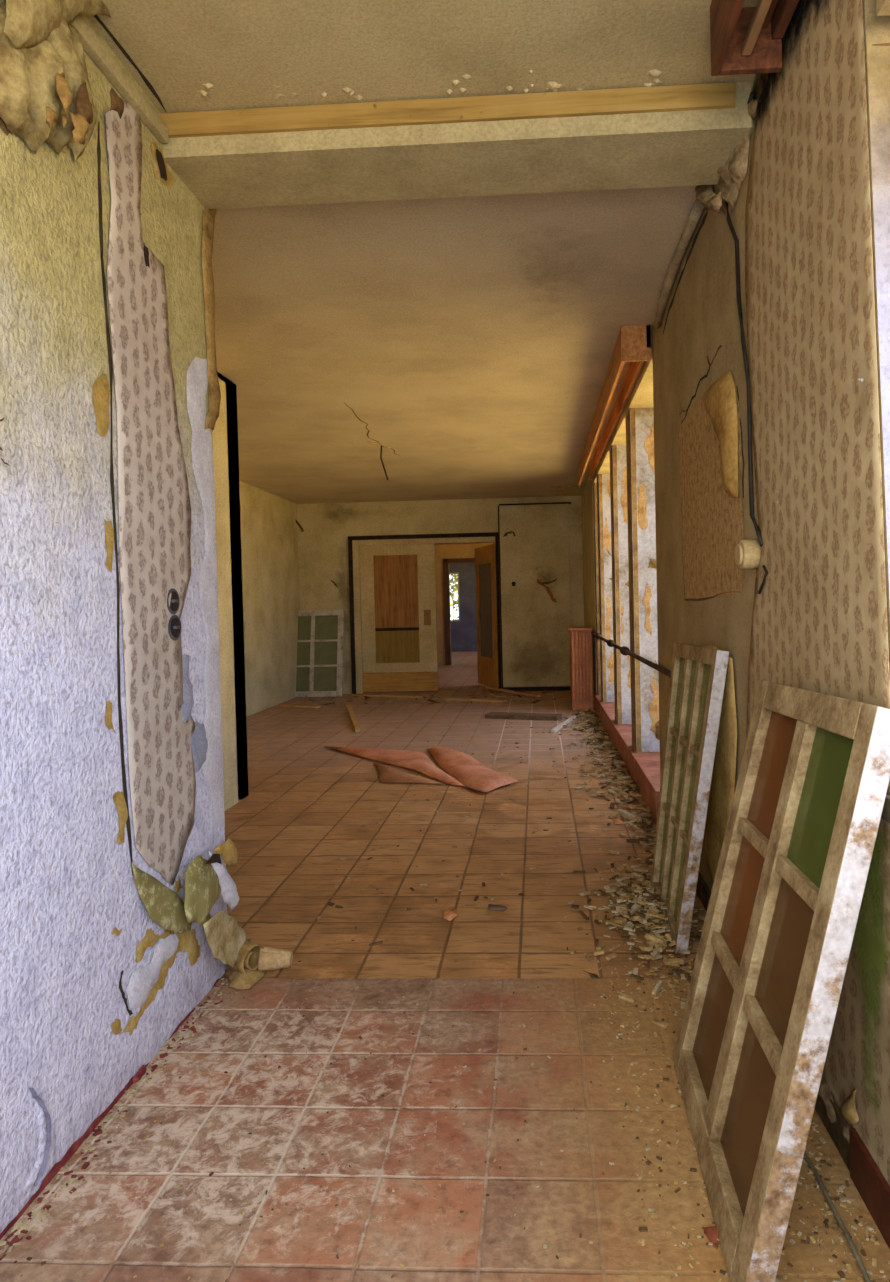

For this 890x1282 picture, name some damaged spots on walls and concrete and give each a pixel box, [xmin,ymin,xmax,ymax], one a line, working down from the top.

water stain [752,0,826,124]
flaking render [151,141,175,188]
crack [344,402,400,456]
crack [679,345,722,428]
flaking render [181,357,225,833]
peeling [111,928,201,1036]